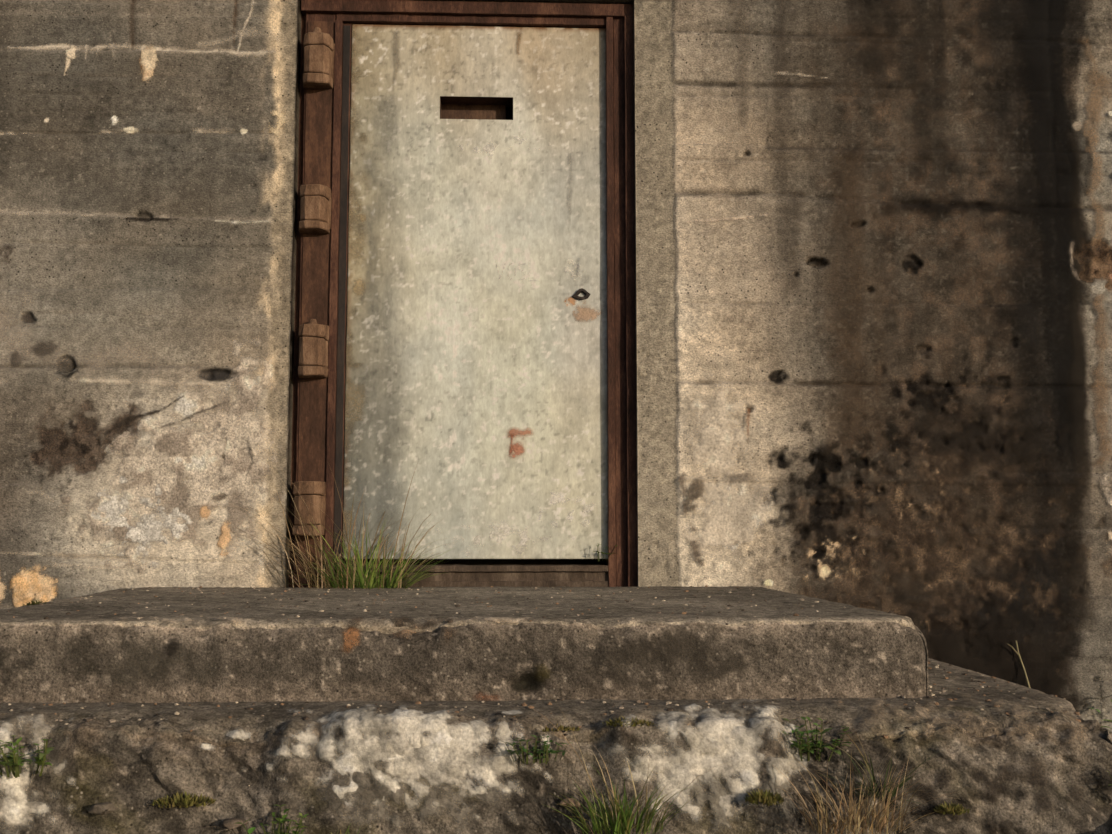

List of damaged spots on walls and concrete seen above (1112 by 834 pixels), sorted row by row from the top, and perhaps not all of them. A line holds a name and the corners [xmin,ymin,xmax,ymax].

peeling [31,342,285,573]
leakage [763,0,1092,709]
spalling [1071,238,1112,291]
peeling [0,566,58,607]